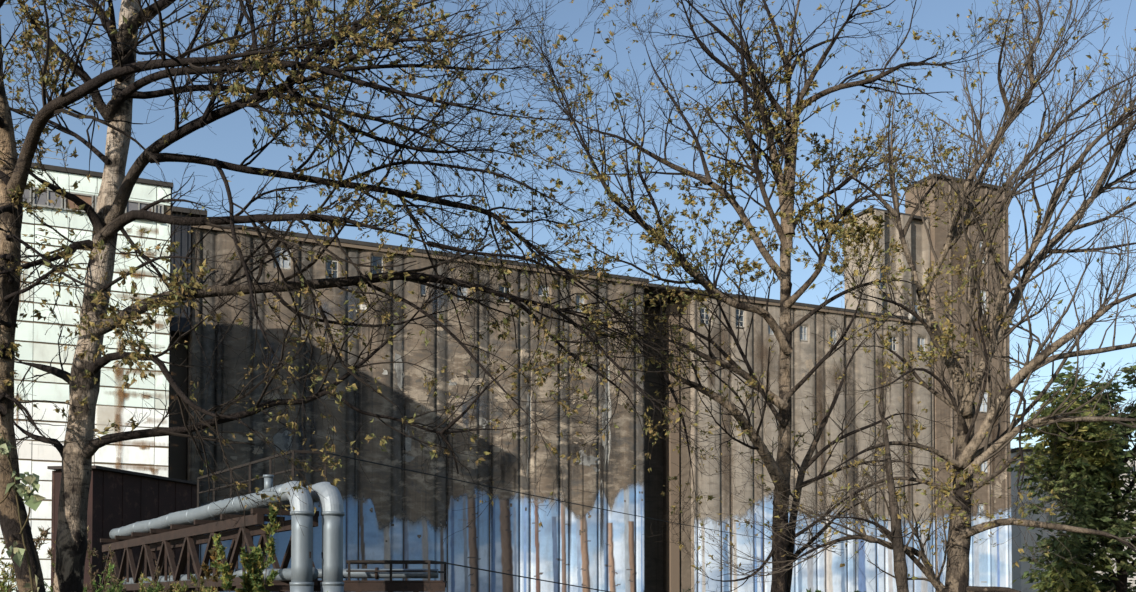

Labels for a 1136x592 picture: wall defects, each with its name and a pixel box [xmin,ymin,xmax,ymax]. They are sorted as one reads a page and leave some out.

corrosion [115,348,149,444]
leakage [556,441,585,526]
leakage [600,432,615,530]